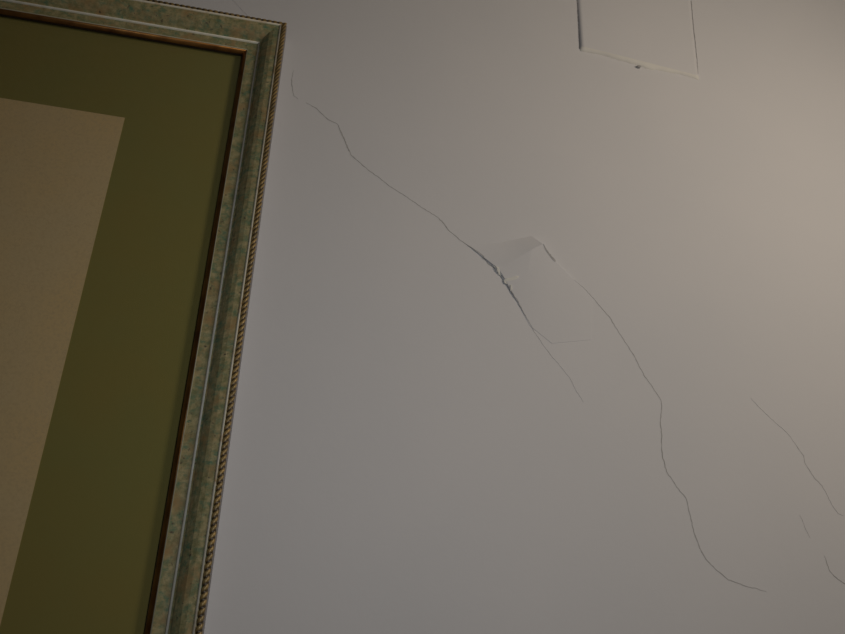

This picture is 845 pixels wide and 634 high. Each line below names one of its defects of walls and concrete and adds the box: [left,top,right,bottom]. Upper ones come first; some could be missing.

crack [291,75,577,392]
crack [578,283,766,592]